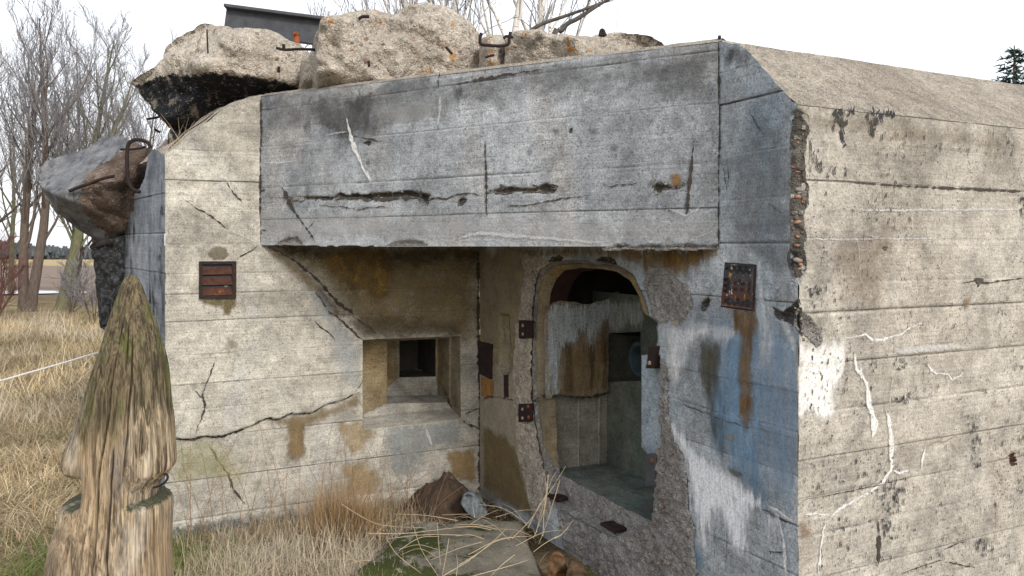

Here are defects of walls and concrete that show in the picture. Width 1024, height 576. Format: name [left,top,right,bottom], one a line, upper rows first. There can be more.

spalling [68,116,161,194]
crack [315,193,480,210]
spalling [787,113,810,278]
crack [176,358,365,504]
crack [238,246,375,340]
spalling [512,252,698,576]
leakage [664,261,810,499]
corrosion [733,310,757,425]
spalling [773,299,823,348]
crack [806,479,903,500]
leakage [807,345,909,573]
crack [904,542,975,573]